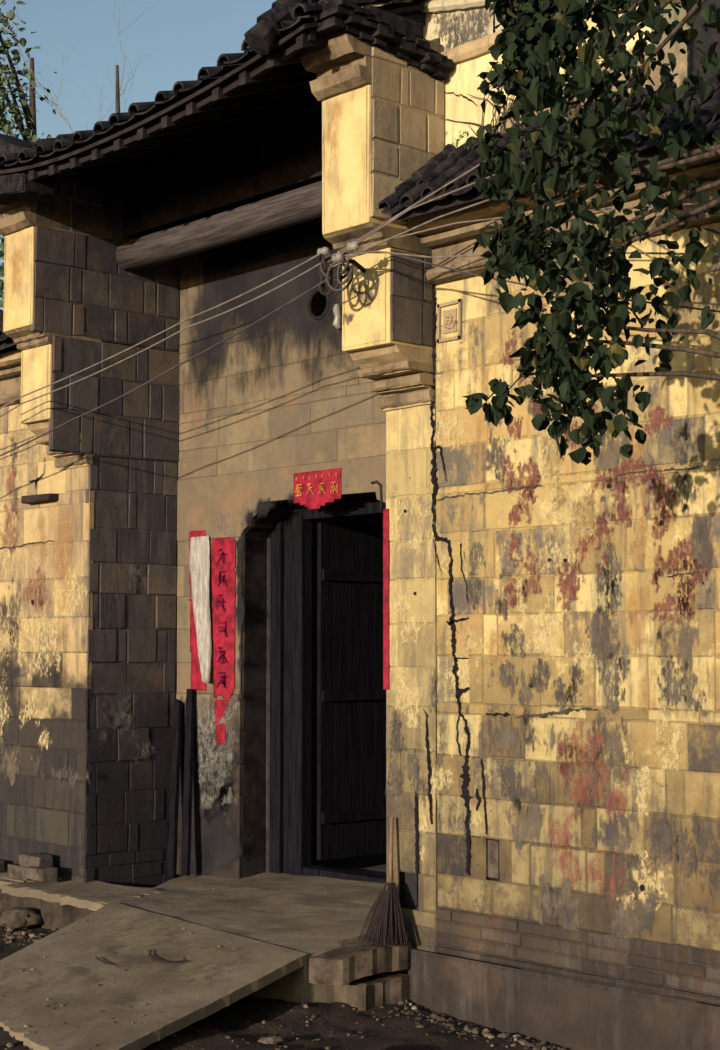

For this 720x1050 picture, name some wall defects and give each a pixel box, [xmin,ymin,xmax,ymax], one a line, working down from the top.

leakage [668,414,713,574]
peeling [0,662,9,739]
peeling [23,568,87,611]
peeling [195,698,239,810]
leakage [385,667,449,809]
crack [414,709,432,874]
crack [430,290,597,875]
leakage [462,542,583,852]
leakage [575,543,634,818]
peeling [543,721,683,898]
leakage [565,798,701,878]
leakage [656,605,706,717]